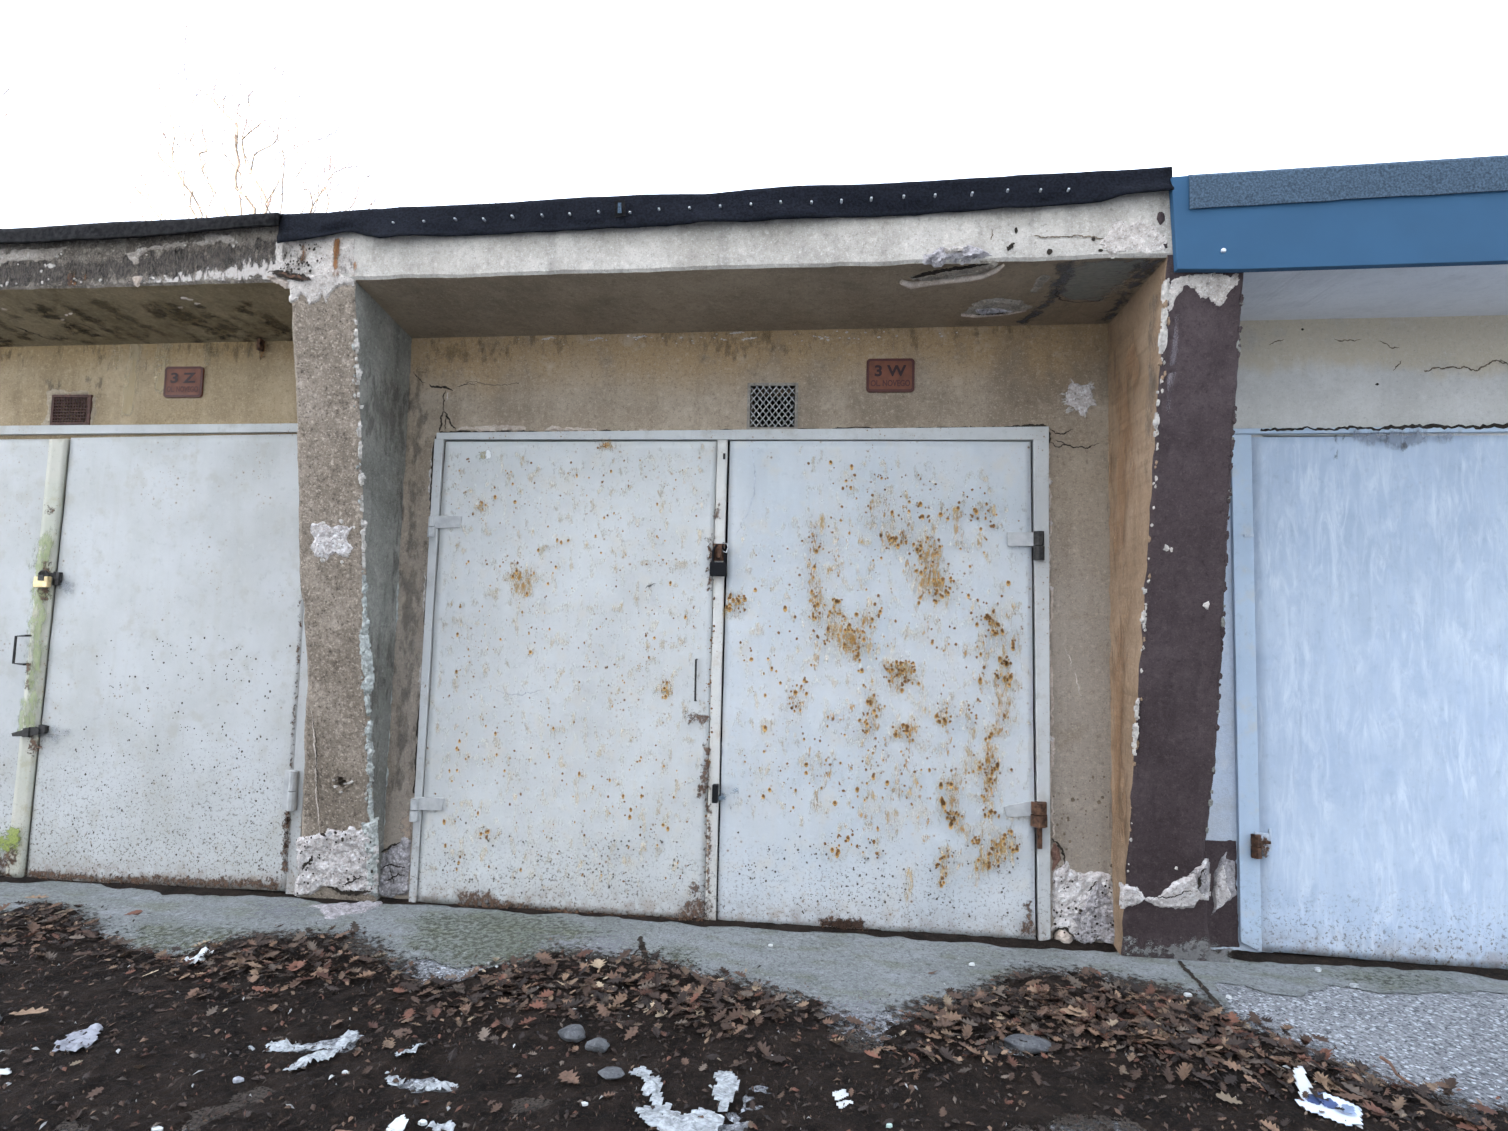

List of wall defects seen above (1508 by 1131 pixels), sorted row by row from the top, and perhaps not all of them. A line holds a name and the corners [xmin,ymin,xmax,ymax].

leakage [0,262,293,414]
leakage [150,238,282,283]
spalling [899,245,1005,289]
peeling [1152,273,1244,488]
crack [1260,423,1508,431]
crack [1270,328,1508,386]
flaking render [293,319,411,919]
corrosion [443,442,715,921]
corrosion [688,460,1022,888]
flaking render [1049,449,1237,944]
corrosion [0,810,292,891]
corrosion [818,915,868,931]